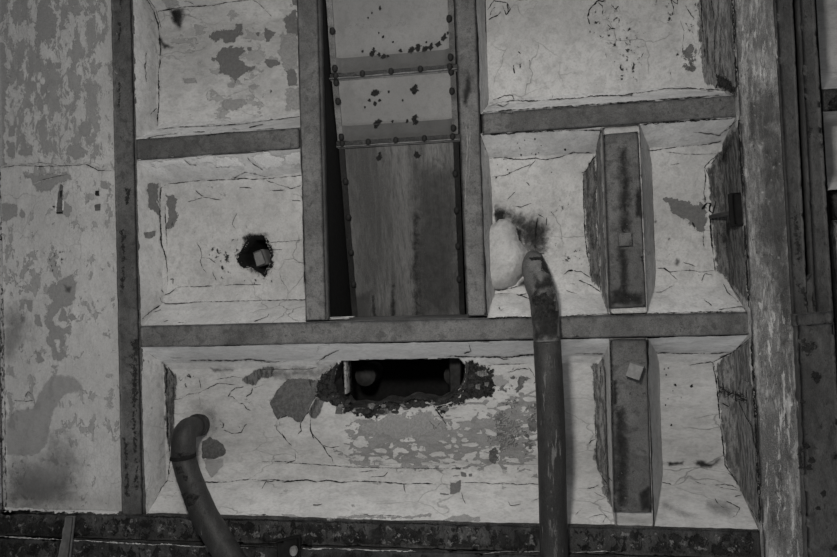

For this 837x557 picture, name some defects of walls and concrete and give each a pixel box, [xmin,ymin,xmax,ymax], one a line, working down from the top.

peeling [0,0,122,217]
peeling [209,24,255,87]
corrosion [378,31,449,53]
crack [483,0,730,113]
crack [144,172,305,323]
spalling [236,233,274,277]
crack [490,131,606,306]
peeling [663,126,748,301]
crack [159,359,290,492]
crack [205,397,538,528]
peeling [315,360,538,495]
corrosion [541,429,563,557]